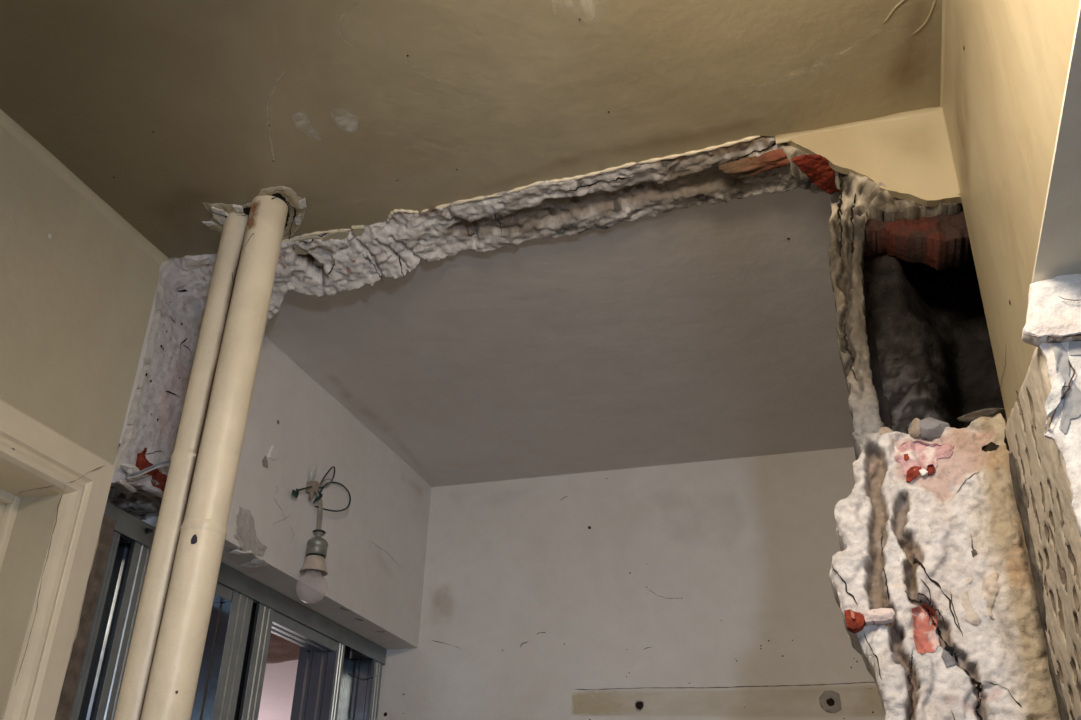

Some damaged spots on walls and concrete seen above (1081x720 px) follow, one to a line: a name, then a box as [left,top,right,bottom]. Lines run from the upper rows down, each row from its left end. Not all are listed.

spalling [202,186,365,255]
spalling [780,143,970,435]
flaking render [107,260,205,520]
flaking render [894,440,954,483]
peeling [1039,340,1081,536]
spalling [228,506,268,568]
crack [832,566,857,604]
flaking render [912,603,941,654]
crack [881,533,1022,720]
peeling [961,572,999,626]